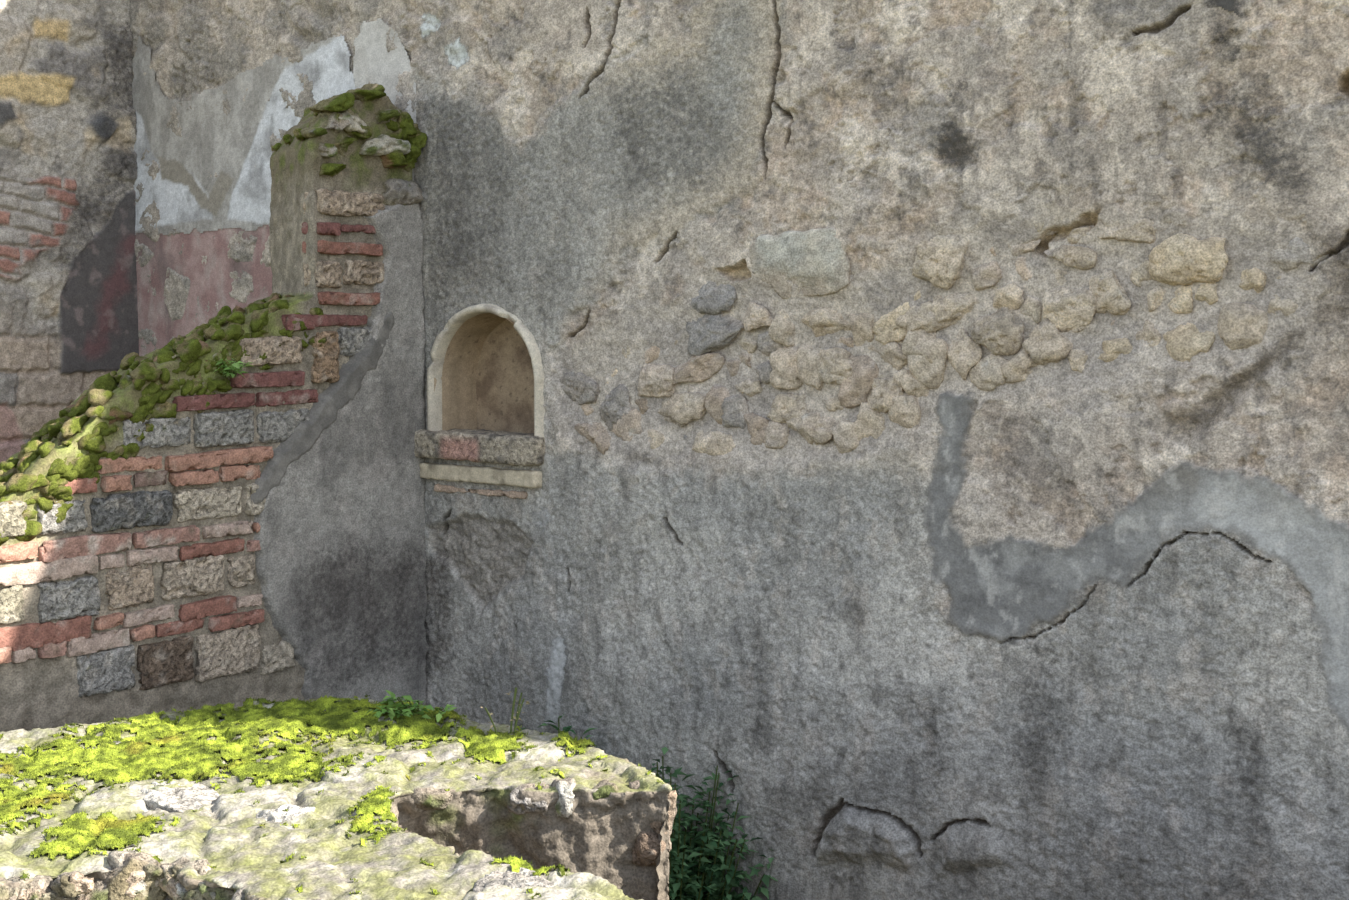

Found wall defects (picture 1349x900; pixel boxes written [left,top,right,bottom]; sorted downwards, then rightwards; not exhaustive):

crack [582,0,621,96]
crack [1131,8,1190,36]
crack [761,0,794,179]
flaking render [132,18,416,235]
spalling [555,201,1329,465]
crack [1136,531,1195,579]
crack [1237,543,1271,564]
crack [1012,607,1081,640]
crack [812,798,991,855]